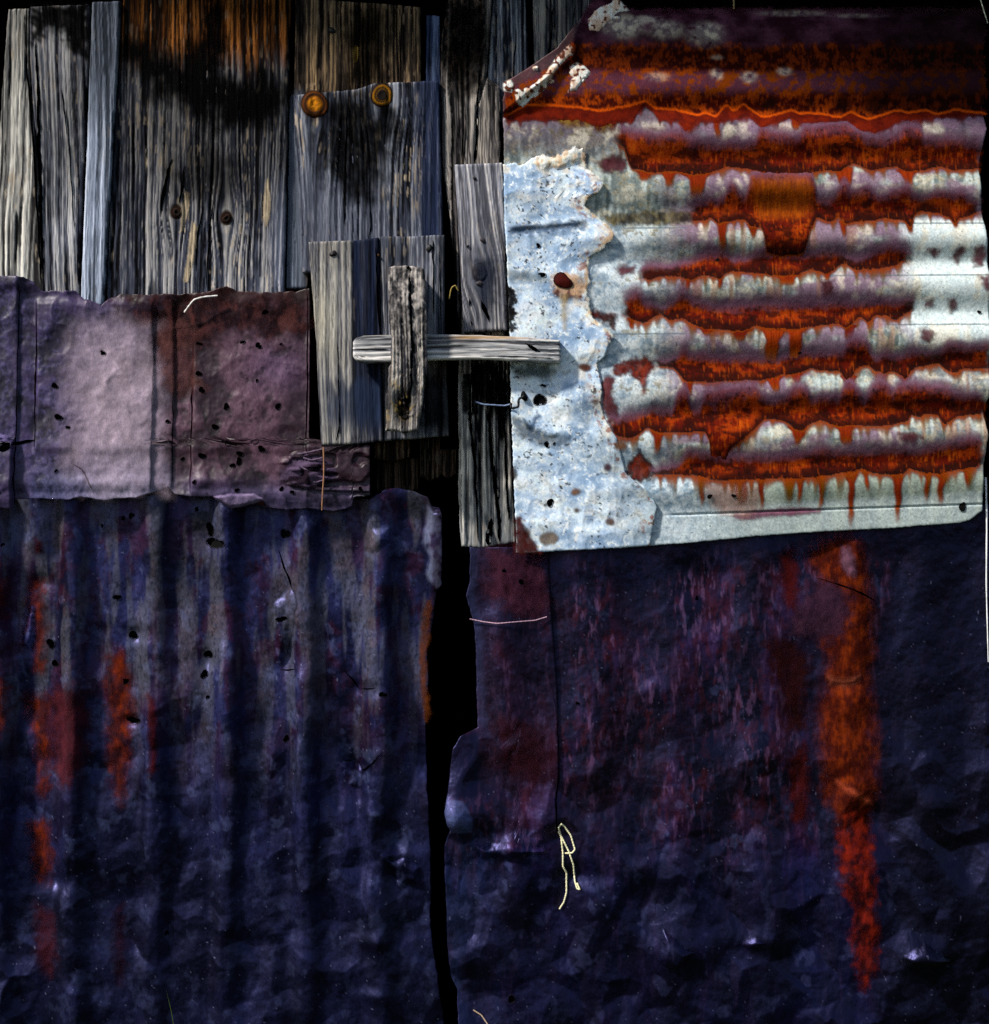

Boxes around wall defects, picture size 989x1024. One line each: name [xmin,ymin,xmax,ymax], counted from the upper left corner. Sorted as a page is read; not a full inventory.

peeling [503,45,590,107]
rust [503,0,989,520]
rust [26,691,88,796]
rust [107,652,133,796]
rust [148,697,156,773]
rust [763,639,808,730]
rust [790,745,807,821]
rust [811,536,879,988]
rust [33,822,52,880]